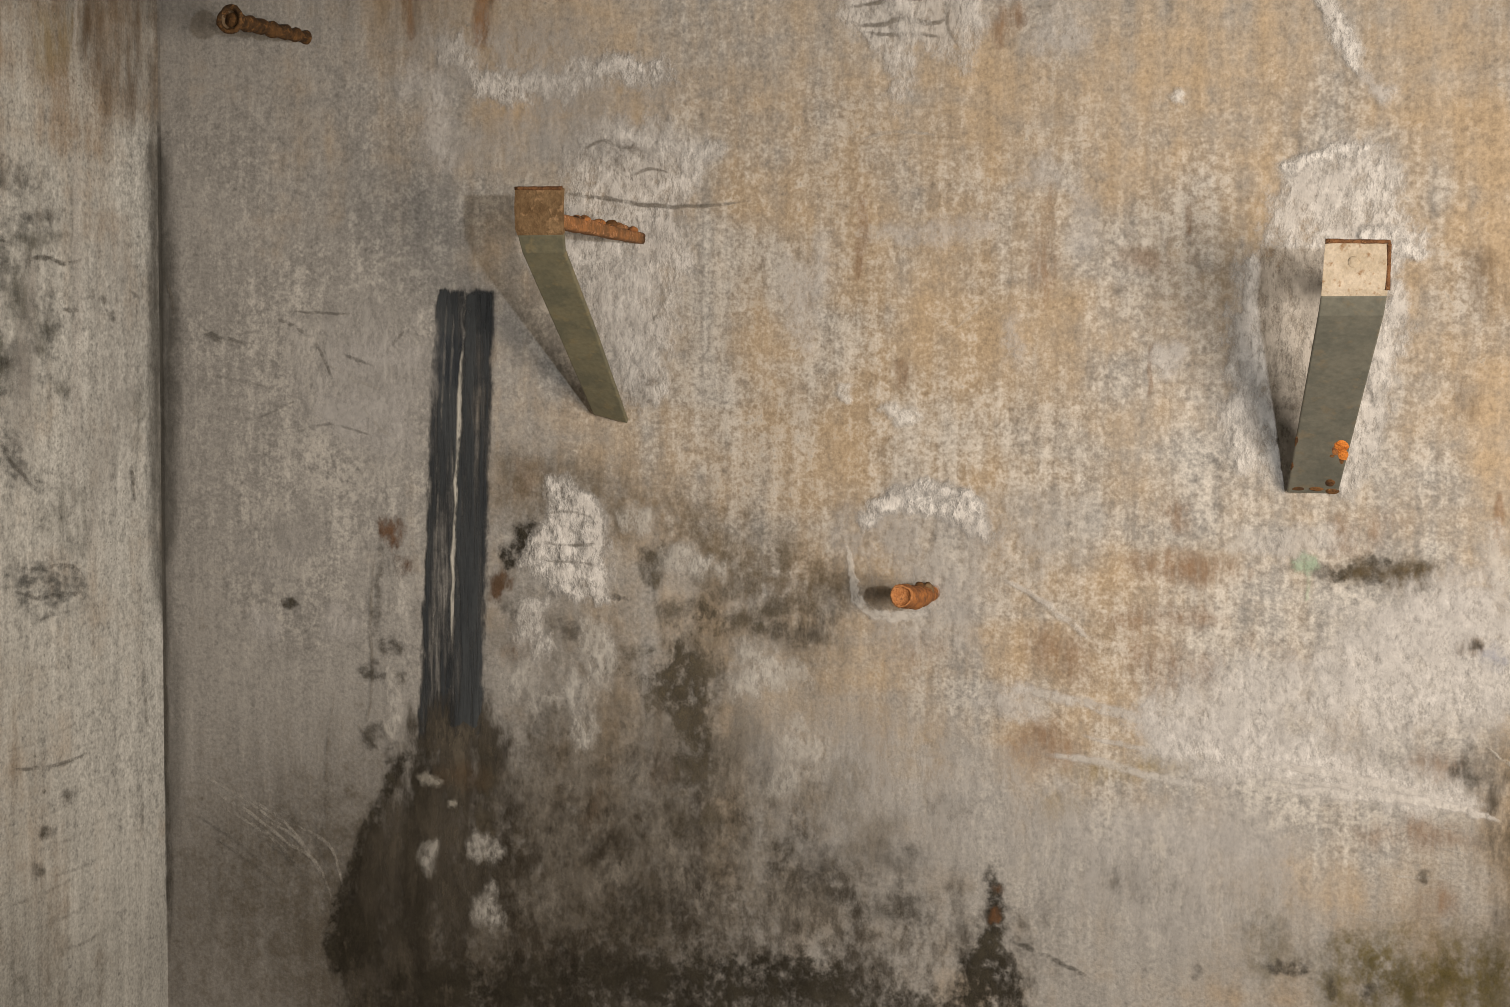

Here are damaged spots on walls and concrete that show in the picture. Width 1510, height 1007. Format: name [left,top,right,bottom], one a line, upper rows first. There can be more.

rust [573,215,638,232]
leakage [500,524,535,570]
leakage [643,551,664,589]
leakage [324,633,1027,1007]